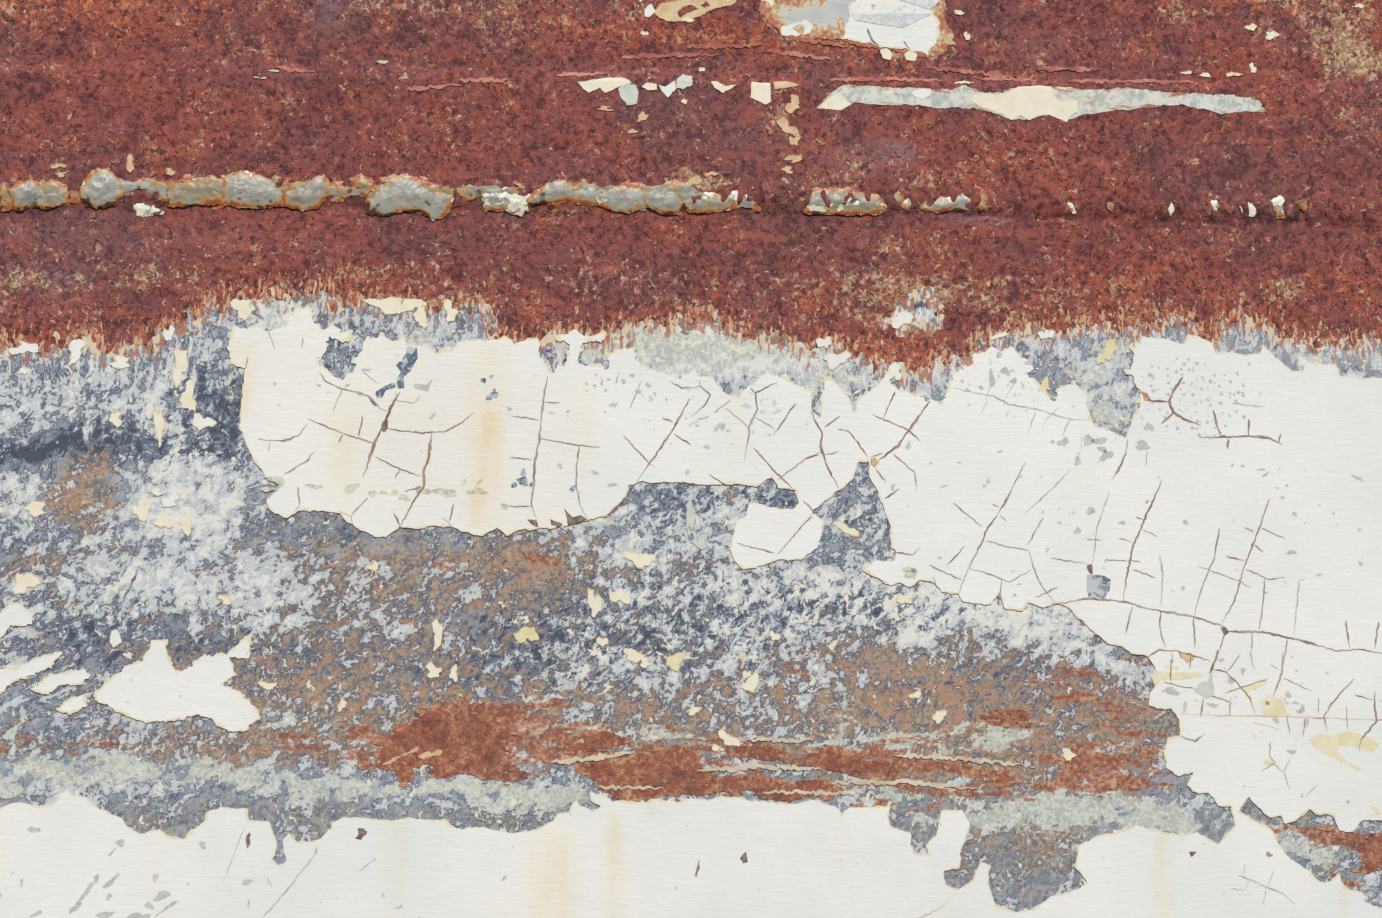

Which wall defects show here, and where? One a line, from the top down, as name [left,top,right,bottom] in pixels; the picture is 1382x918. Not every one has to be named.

peeling [758,0,970,61]
peeling [817,84,1266,122]
rust [0,0,1382,374]
crack [244,329,474,527]
peeling [0,285,1382,918]
crack [508,371,1382,796]
rust [354,700,531,787]
rust [551,729,1034,804]
rust [980,707,1034,728]